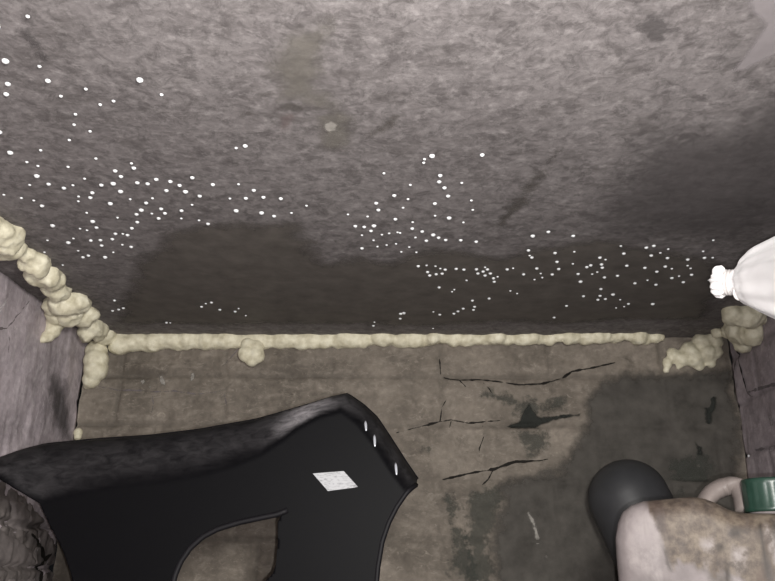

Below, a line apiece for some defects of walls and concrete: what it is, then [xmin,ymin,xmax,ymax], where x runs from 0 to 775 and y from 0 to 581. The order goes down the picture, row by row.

water stain [122,223,714,326]
crack [439,359,615,393]
crack [733,351,775,397]
crack [396,401,500,451]
crack [442,459,548,485]
water stain [452,487,502,581]